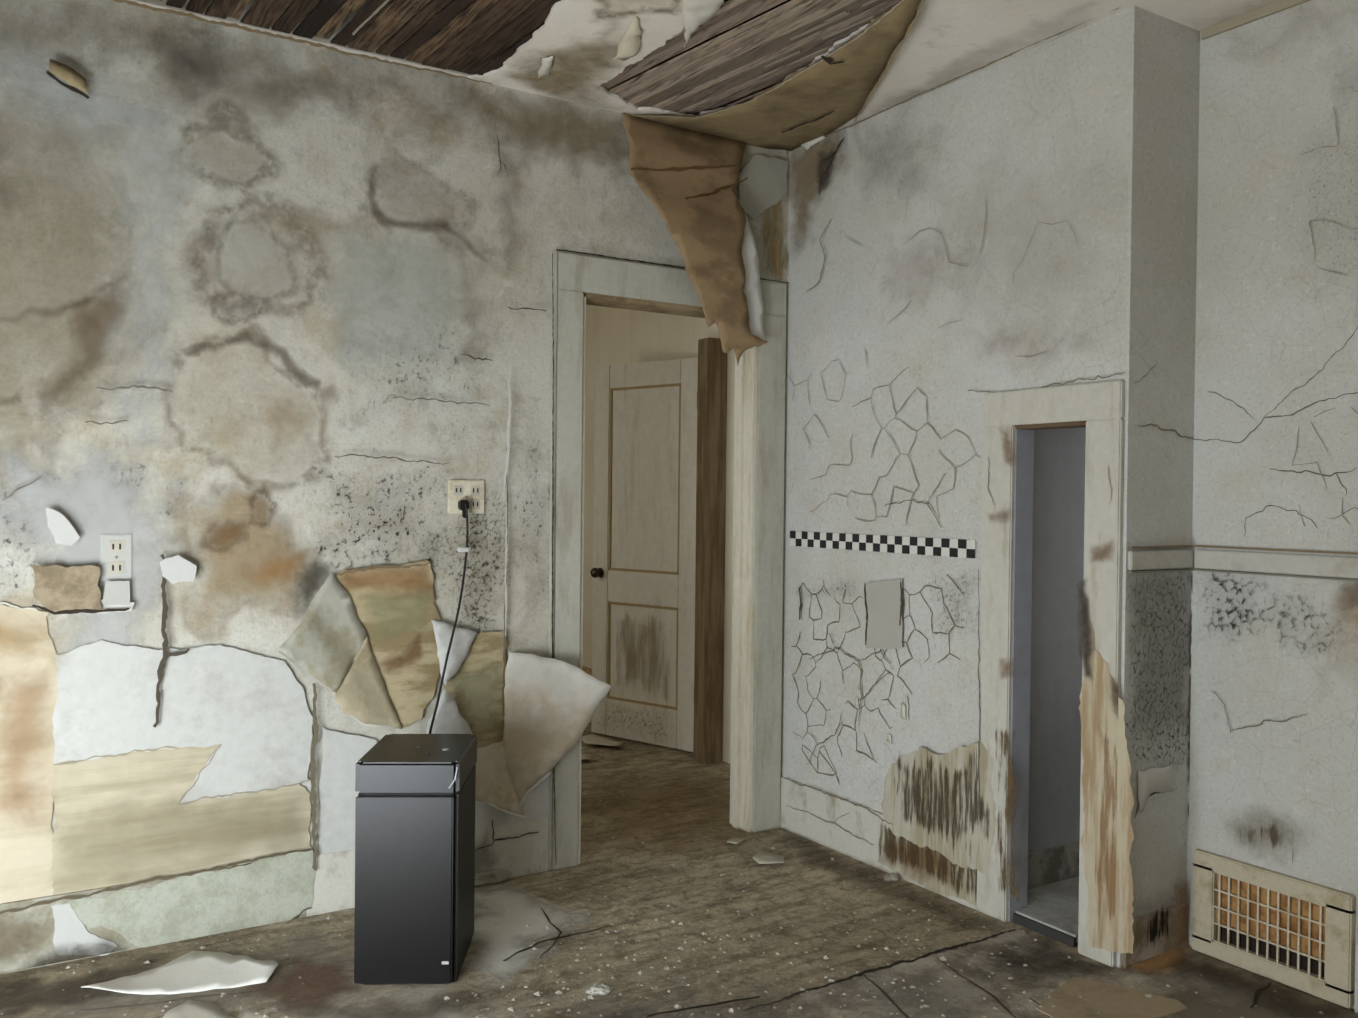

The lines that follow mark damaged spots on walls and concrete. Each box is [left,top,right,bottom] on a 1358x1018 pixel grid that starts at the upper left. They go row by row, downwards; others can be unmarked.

spalling [599,0,900,115]
peeling [801,136,827,150]
crack [789,348,994,527]
crack [1141,327,1358,537]
leakage [0,490,38,588]
flaking render [0,459,315,967]
crack [153,554,190,728]
flaking render [279,560,612,818]
crack [786,569,981,845]
leakage [1127,579,1189,763]
leakage [1209,573,1334,652]
crack [647,996,760,1017]